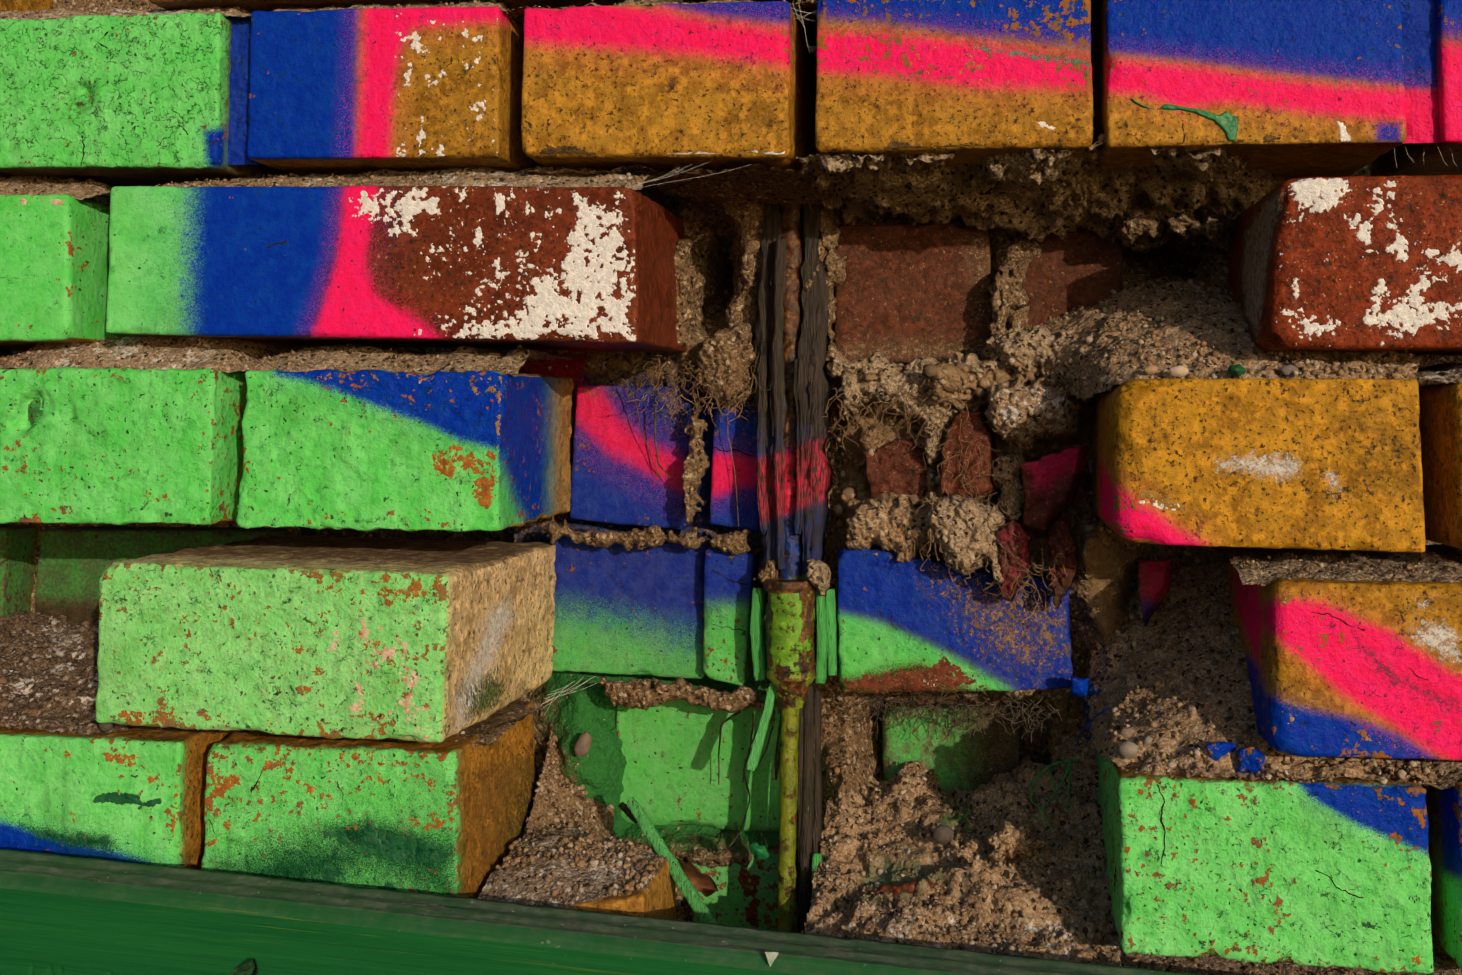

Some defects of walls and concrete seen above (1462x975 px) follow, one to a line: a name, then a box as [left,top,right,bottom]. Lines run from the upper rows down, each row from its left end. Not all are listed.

peeling [1228,364,1246,377]
peeling [1133,486,1186,516]
peeling [843,654,989,693]
peeling [738,867,761,928]